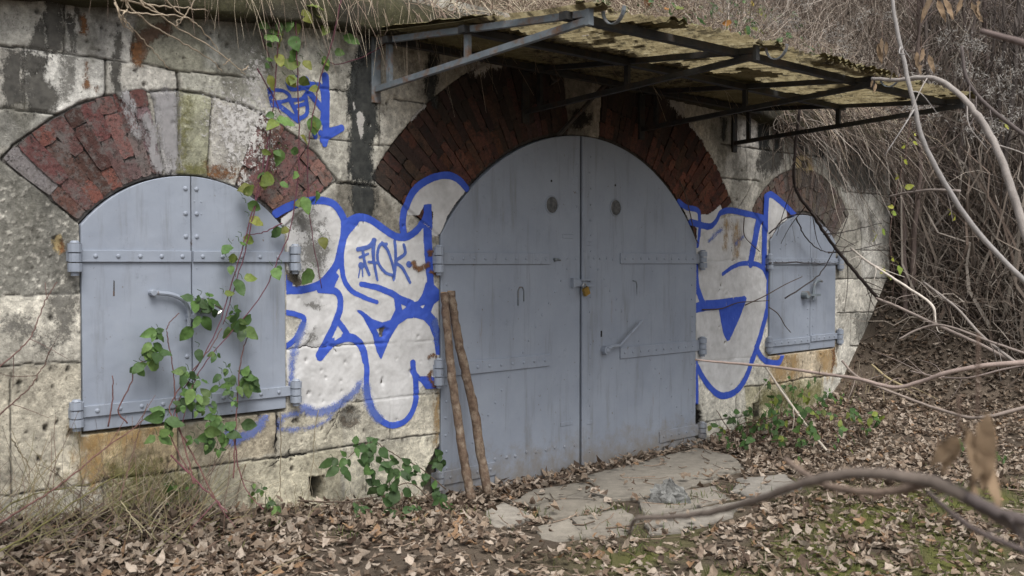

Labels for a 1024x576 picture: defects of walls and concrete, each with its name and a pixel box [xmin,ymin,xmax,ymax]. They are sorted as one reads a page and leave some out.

damp [346,36,381,216]
damp [410,52,440,121]